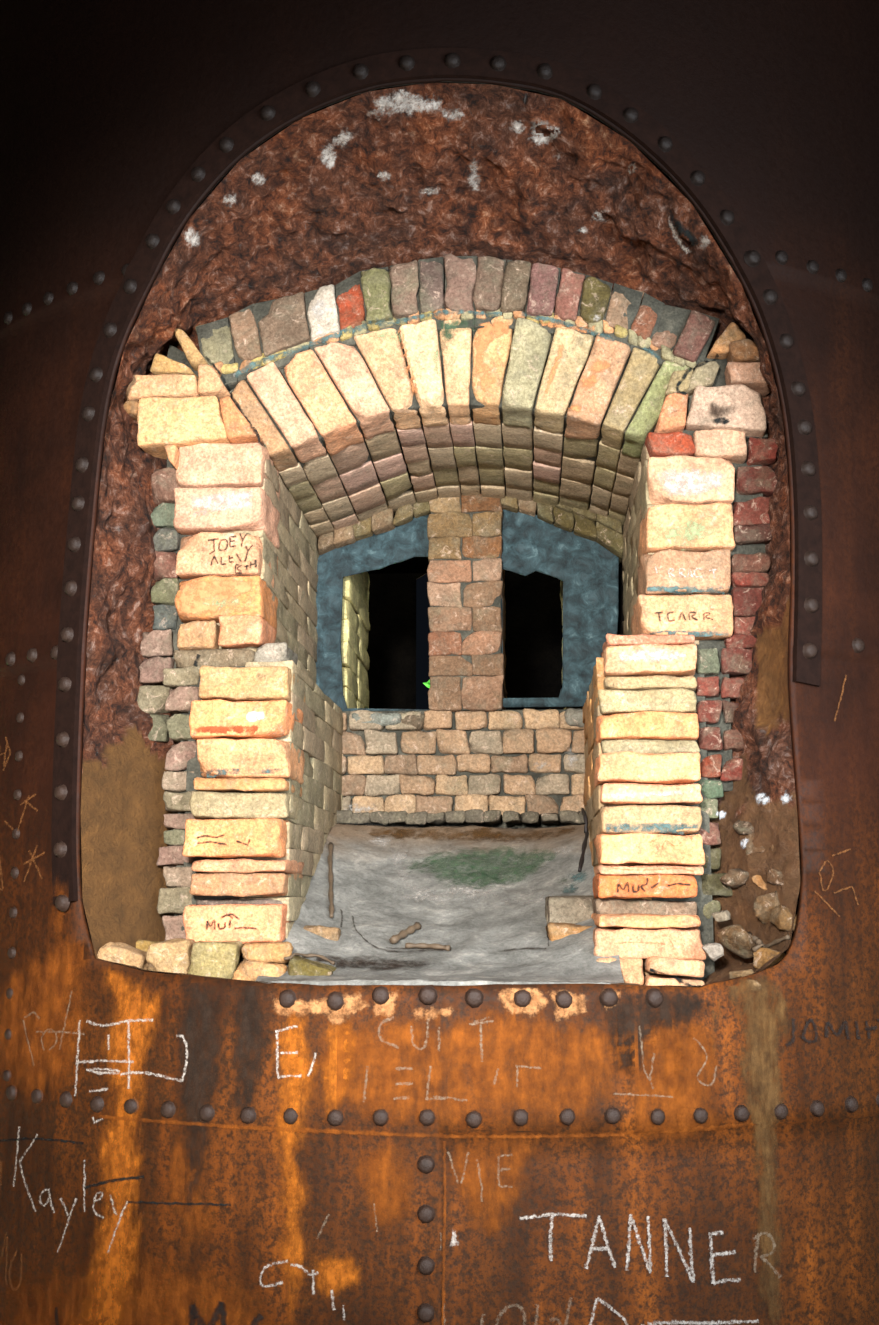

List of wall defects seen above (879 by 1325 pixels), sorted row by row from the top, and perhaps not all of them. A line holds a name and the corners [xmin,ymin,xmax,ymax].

rust [1,946,84,1091]
rust [2,973,252,1325]
leakage [178,986,266,1201]
rust [222,988,715,1325]